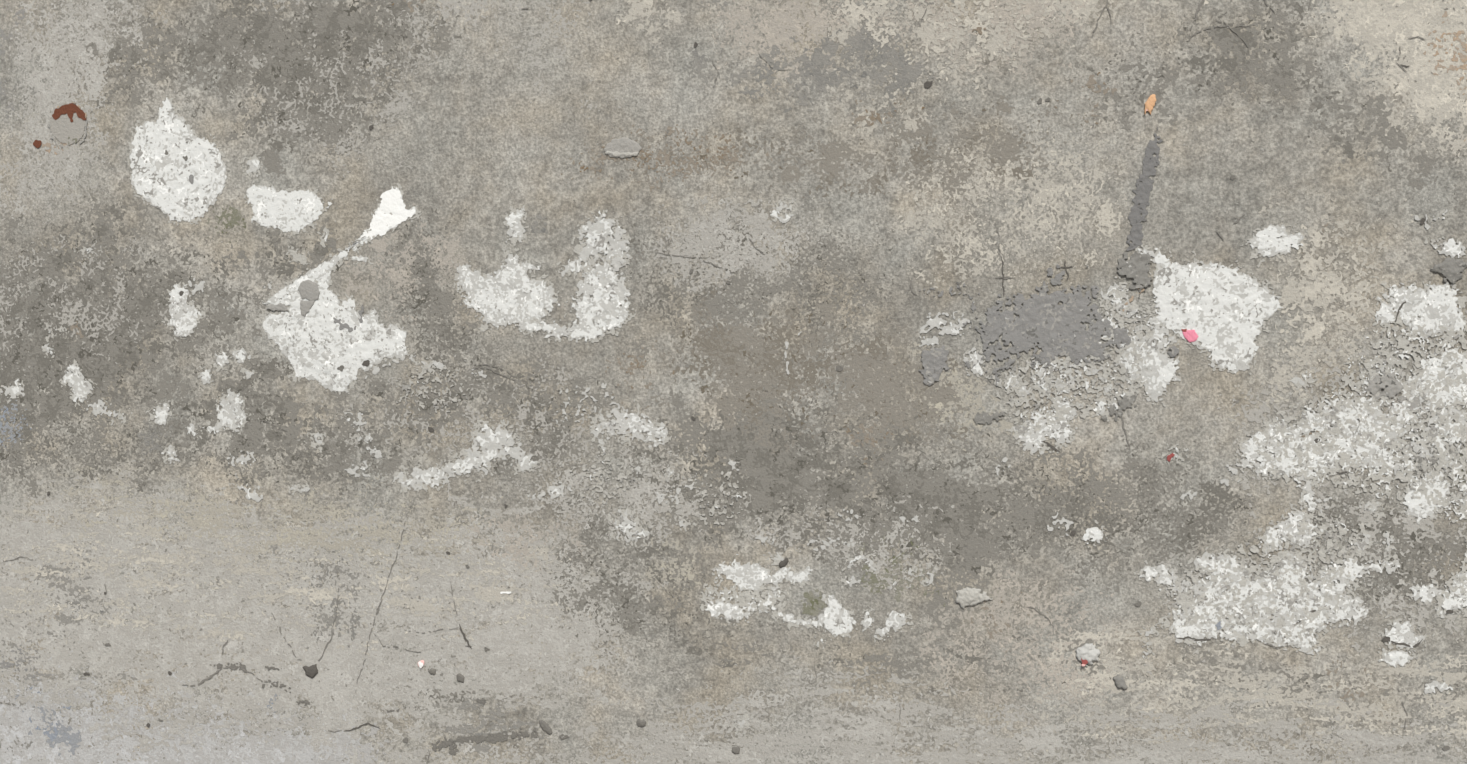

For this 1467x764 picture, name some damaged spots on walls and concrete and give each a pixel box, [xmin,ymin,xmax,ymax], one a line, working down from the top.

corrosion [33,101,87,155]
damp [172,204,259,245]
damp [1217,207,1432,436]
crack [185,566,339,687]
crack [330,512,472,732]